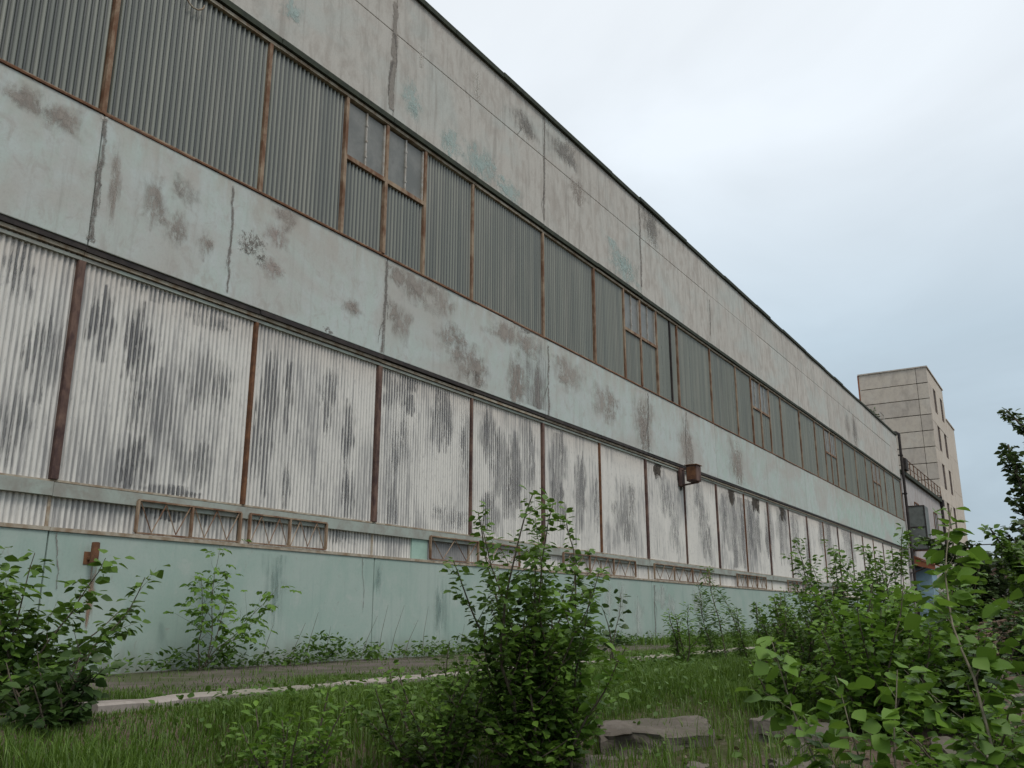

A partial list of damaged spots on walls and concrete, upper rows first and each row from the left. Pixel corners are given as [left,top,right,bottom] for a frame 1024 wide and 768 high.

crack [388,1,399,110]
crack [89,119,108,240]
crack [226,188,235,292]
water stain [498,324,545,409]